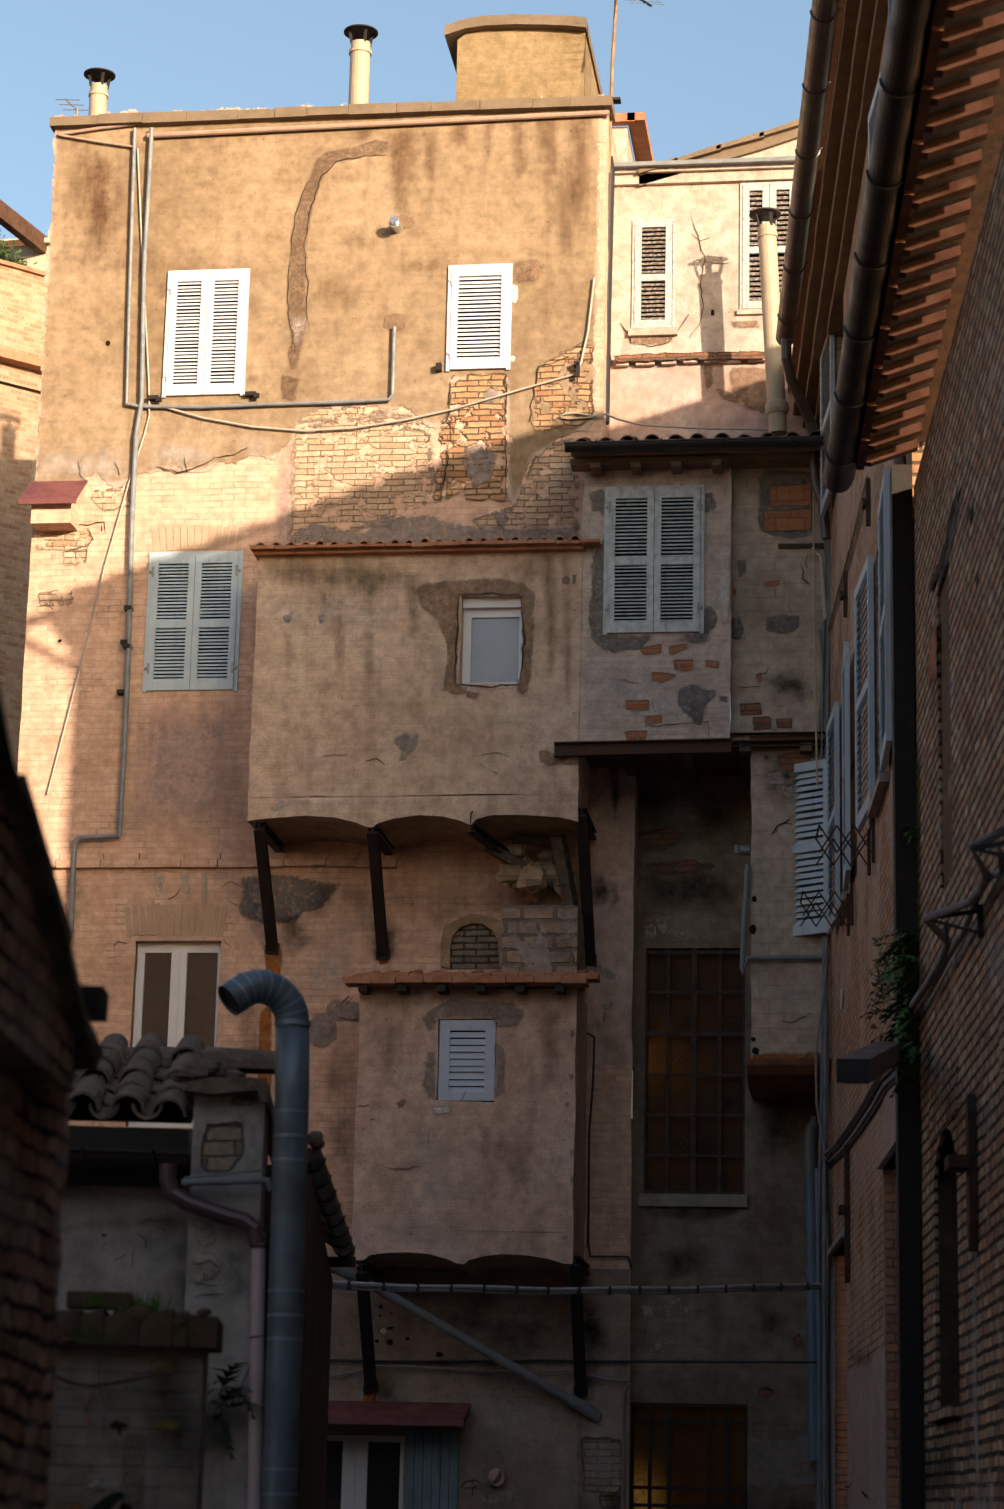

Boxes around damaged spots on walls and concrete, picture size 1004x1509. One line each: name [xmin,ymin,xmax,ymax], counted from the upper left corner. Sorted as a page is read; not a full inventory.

crack [504,184,726,497]
spalling [614,336,765,362]
spalling [287,344,595,541]
crack [434,384,451,503]
spalling [624,700,662,740]
spalling [640,644,815,798]